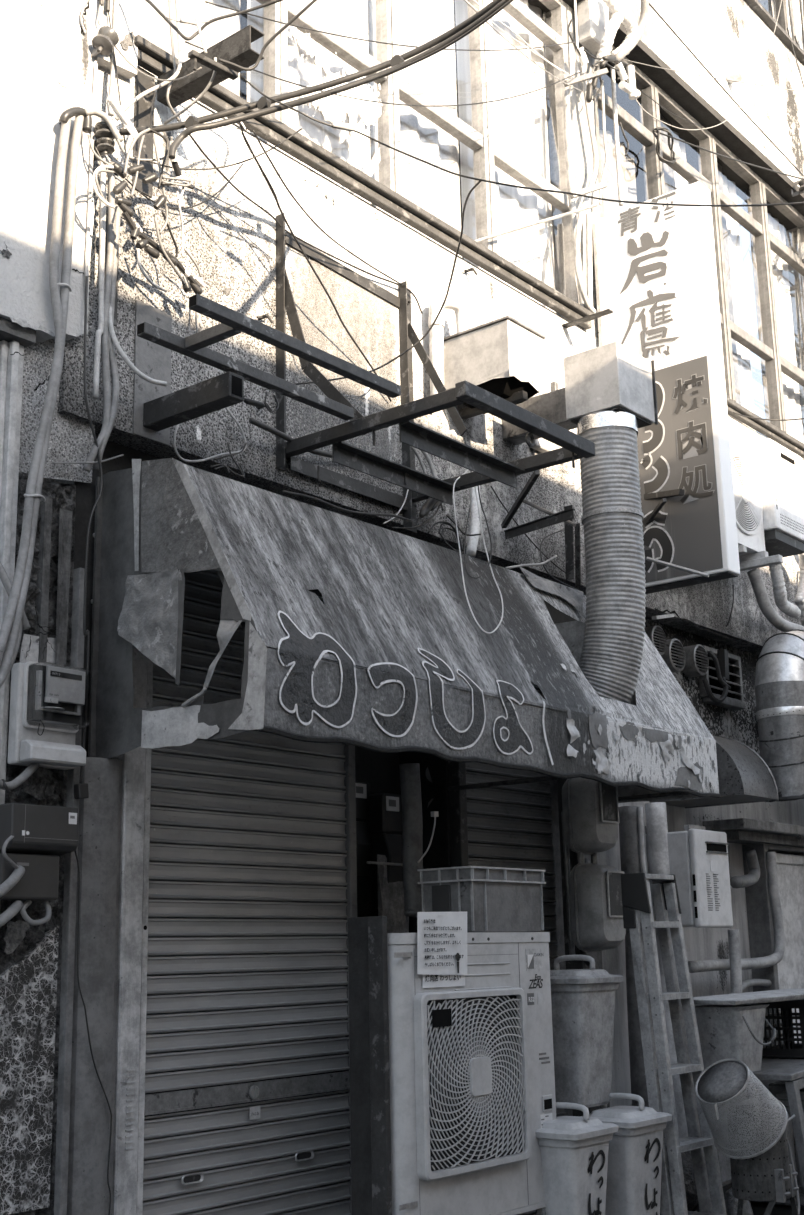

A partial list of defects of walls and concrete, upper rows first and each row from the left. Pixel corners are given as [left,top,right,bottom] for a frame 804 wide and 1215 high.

damp [725,1,745,43]
damp [766,45,804,178]
peeling [566,706,715,793]